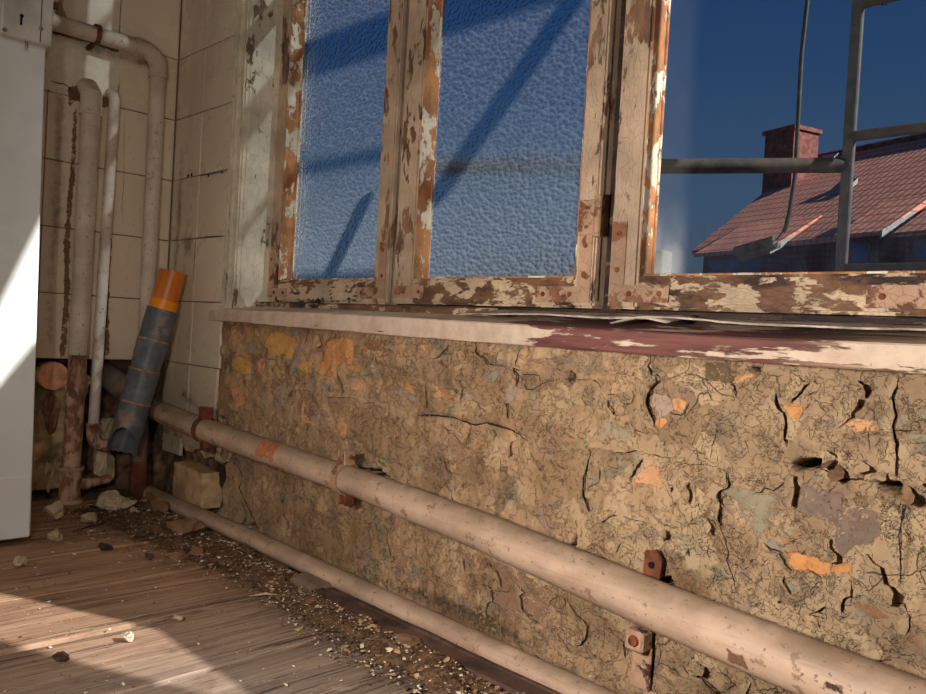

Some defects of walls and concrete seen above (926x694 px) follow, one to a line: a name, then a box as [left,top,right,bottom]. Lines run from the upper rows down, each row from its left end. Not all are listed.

peeling [650,393,687,429]
peeling [705,361,761,403]
crack [762,373,826,447]
crack [809,378,913,481]
peeling [836,380,926,441]
crack [575,358,784,586]
spalling [797,458,822,468]
peeling [841,454,926,490]
crack [762,543,853,628]
crack [895,505,910,636]
crack [683,657,751,694]
peeling [727,649,748,669]